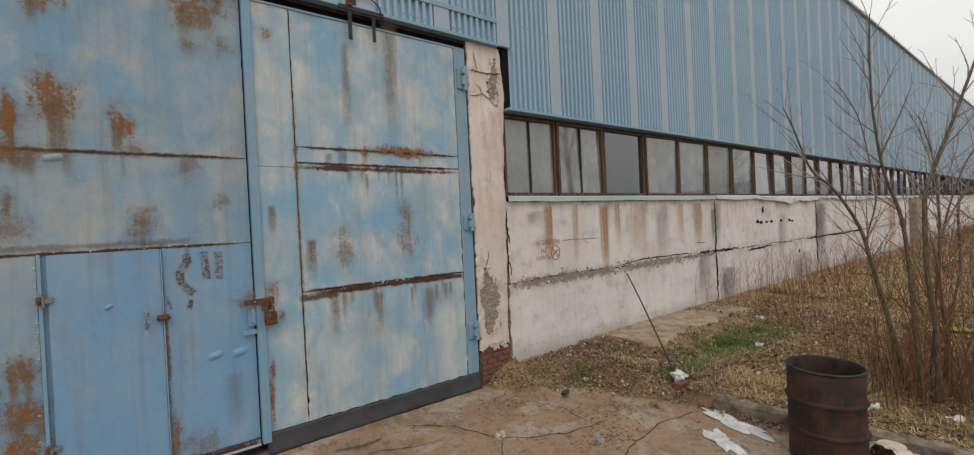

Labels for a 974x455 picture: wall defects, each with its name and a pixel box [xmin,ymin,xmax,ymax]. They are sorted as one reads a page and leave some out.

rust [171,0,231,29]
rust [0,69,223,166]
spalling [488,59,499,107]
rust [293,142,462,320]
spalling [512,251,715,290]
spalling [479,266,545,381]
rust [0,356,55,455]